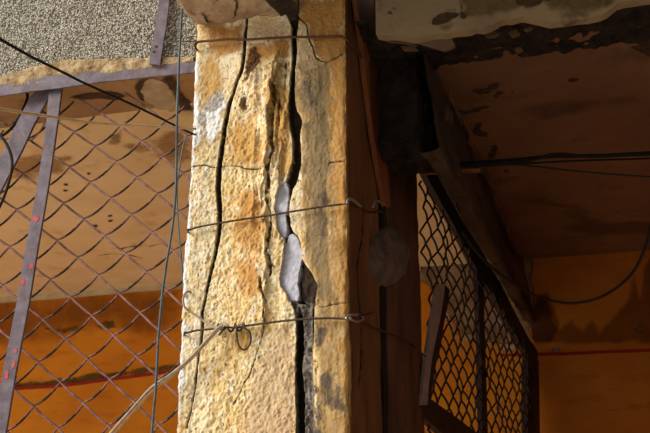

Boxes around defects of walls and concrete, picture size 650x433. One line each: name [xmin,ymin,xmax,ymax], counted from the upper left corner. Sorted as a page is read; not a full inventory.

peeling [432,12,467,25]
crack [285,19,343,244]
crack [187,0,265,427]
crack [298,265,306,305]
leakage [530,260,650,344]